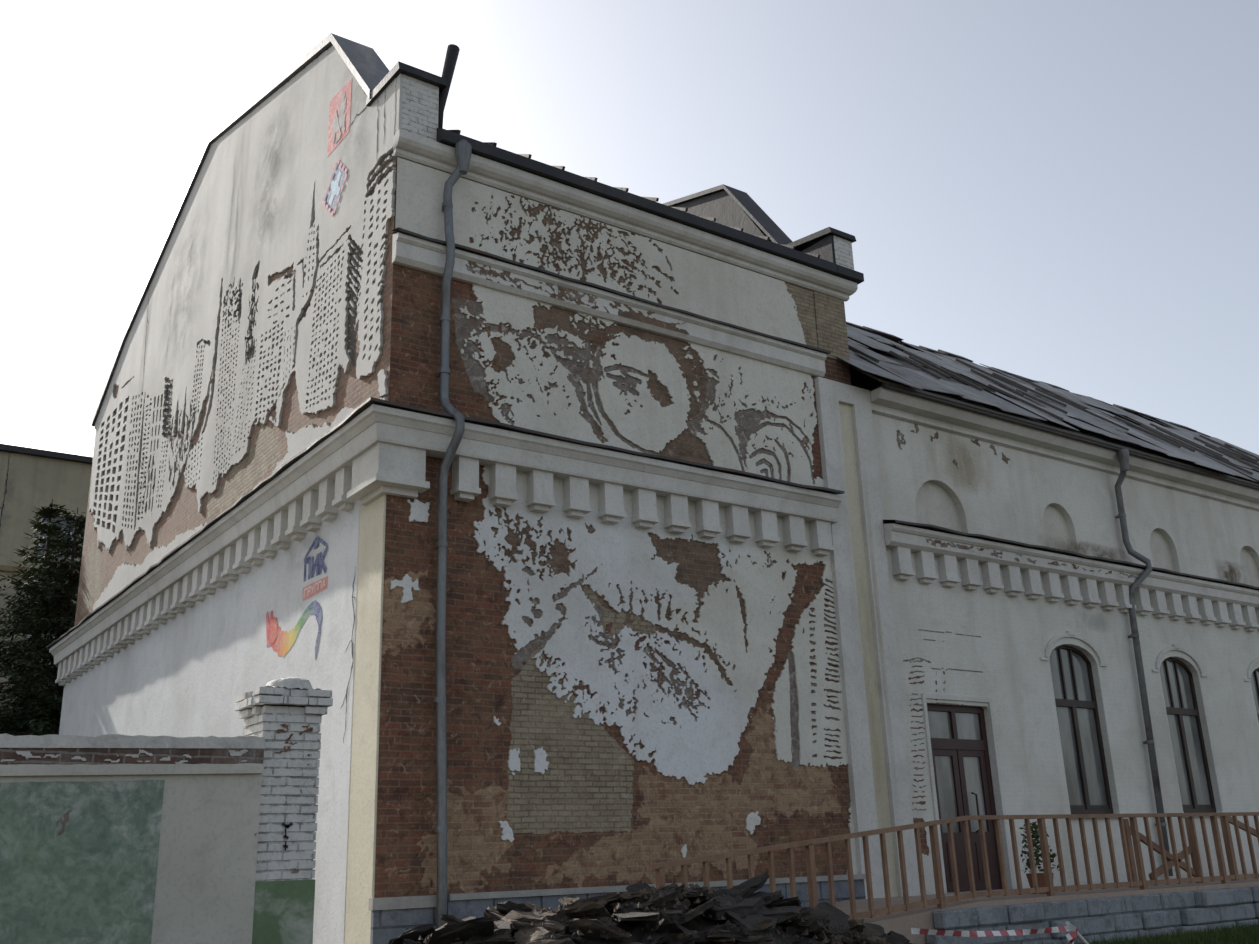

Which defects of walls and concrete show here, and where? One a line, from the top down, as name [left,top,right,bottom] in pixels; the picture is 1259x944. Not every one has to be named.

crack [340,95,385,169]
flaking render [74,196,823,626]
peeling [0,749,86,762]
peeling [104,750,191,764]
crack [340,575,356,743]
flaking render [374,456,851,898]